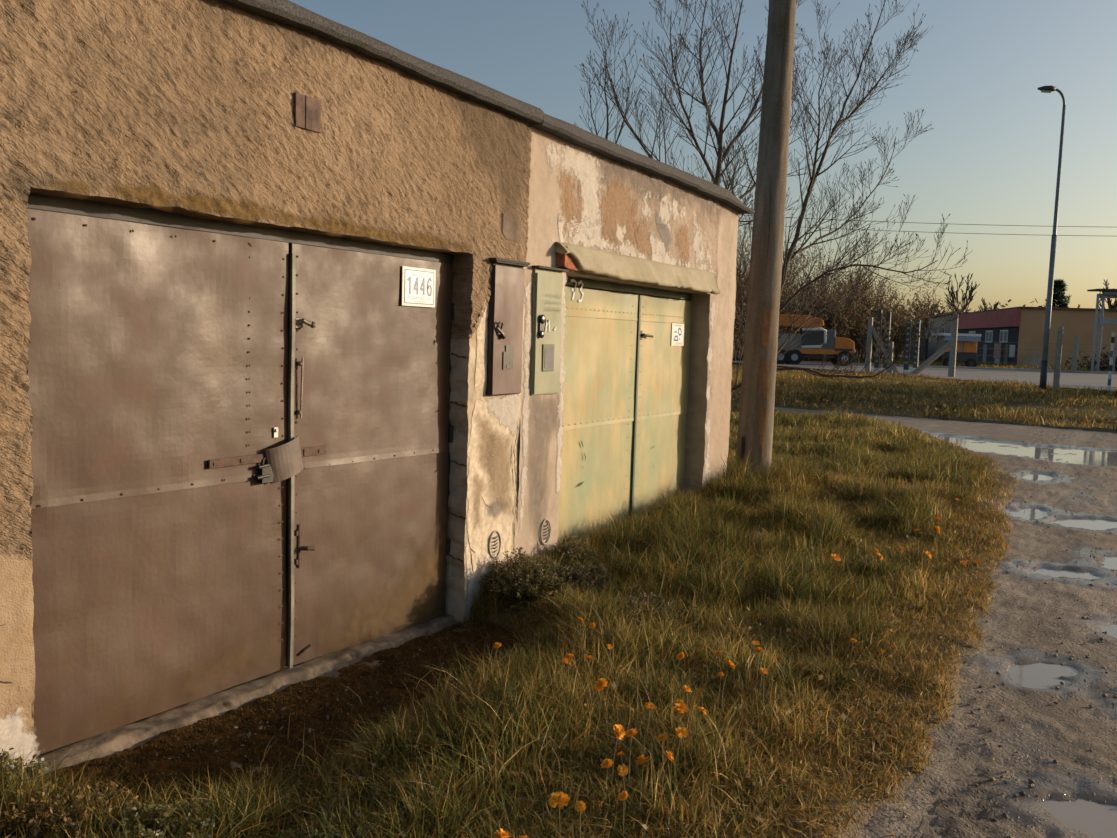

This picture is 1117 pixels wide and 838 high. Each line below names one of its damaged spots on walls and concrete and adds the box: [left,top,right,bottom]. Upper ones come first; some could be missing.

peeling [546,141,717,493]